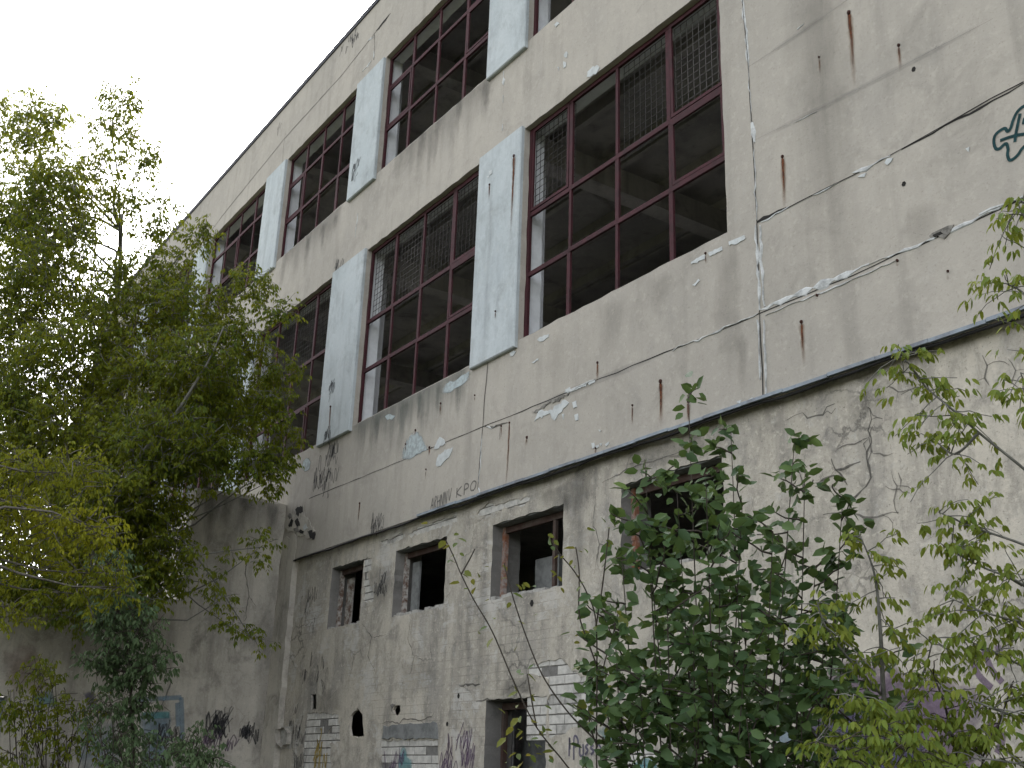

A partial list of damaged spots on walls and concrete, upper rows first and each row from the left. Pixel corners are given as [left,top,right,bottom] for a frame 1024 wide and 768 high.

peeling [691,235,746,264]
peeling [443,372,469,393]
crack [980,355,1024,388]
peeling [532,380,595,422]
peeling [402,432,453,467]
crack [787,386,916,546]